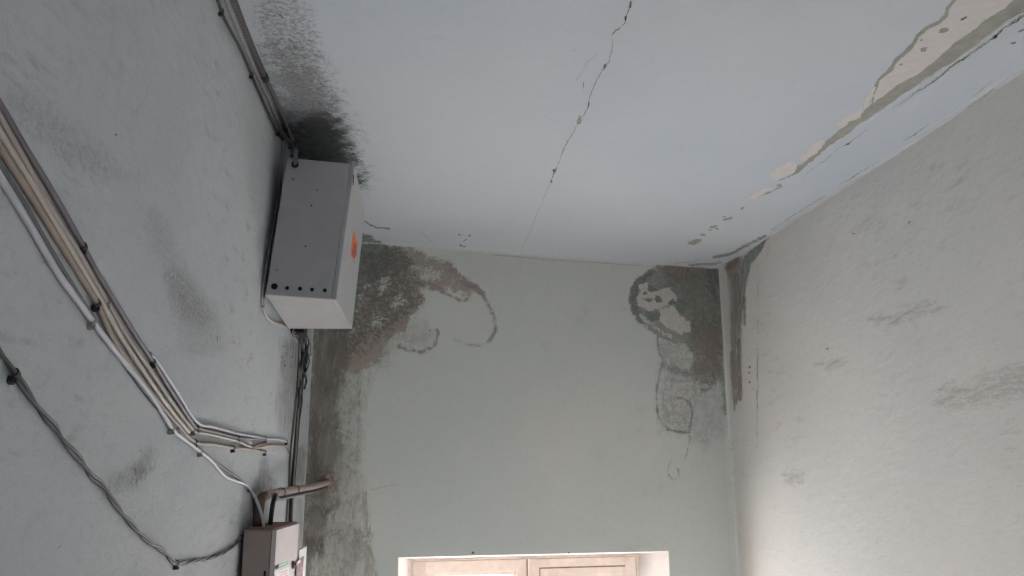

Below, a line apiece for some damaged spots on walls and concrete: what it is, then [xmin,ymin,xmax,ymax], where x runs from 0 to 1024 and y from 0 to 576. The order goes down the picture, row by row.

water stain [284,91,365,185]
crack [498,2,640,266]
peeling [688,0,1024,245]
water stain [296,221,497,576]